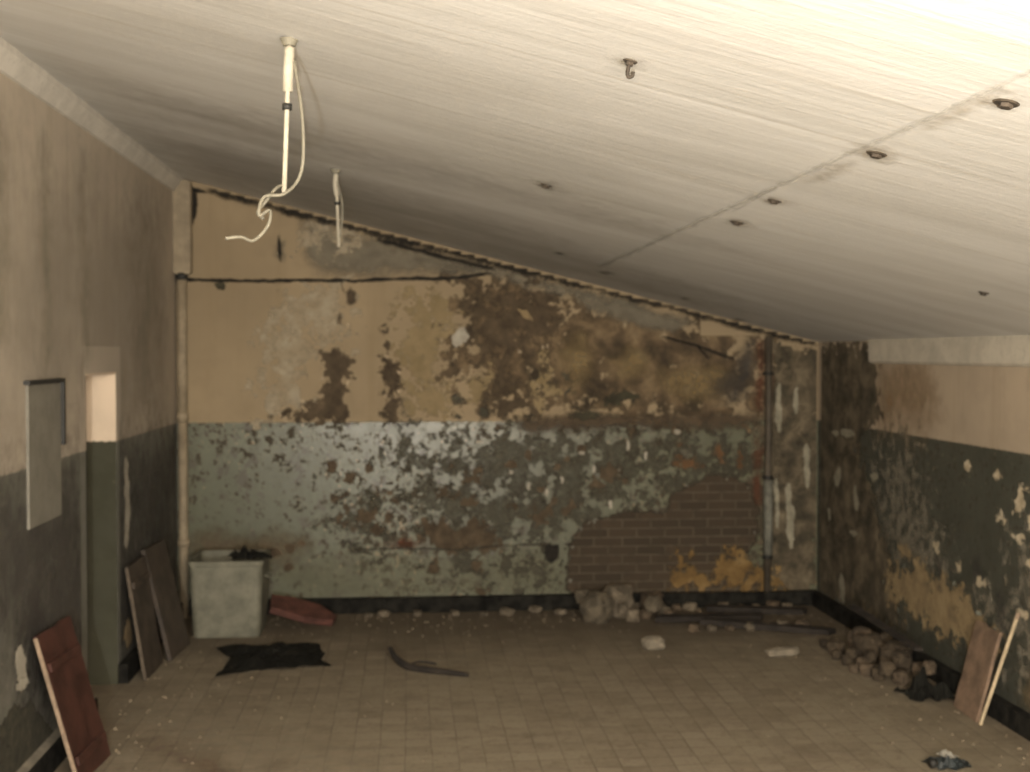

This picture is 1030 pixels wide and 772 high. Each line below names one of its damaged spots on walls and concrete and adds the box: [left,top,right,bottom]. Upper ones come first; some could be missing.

spalling [15,644,29,693]
peeling [304,275,795,595]
damp [423,261,925,634]
peeling [774,383,799,433]
peeling [803,443,811,488]
spalling [870,412,1030,699]